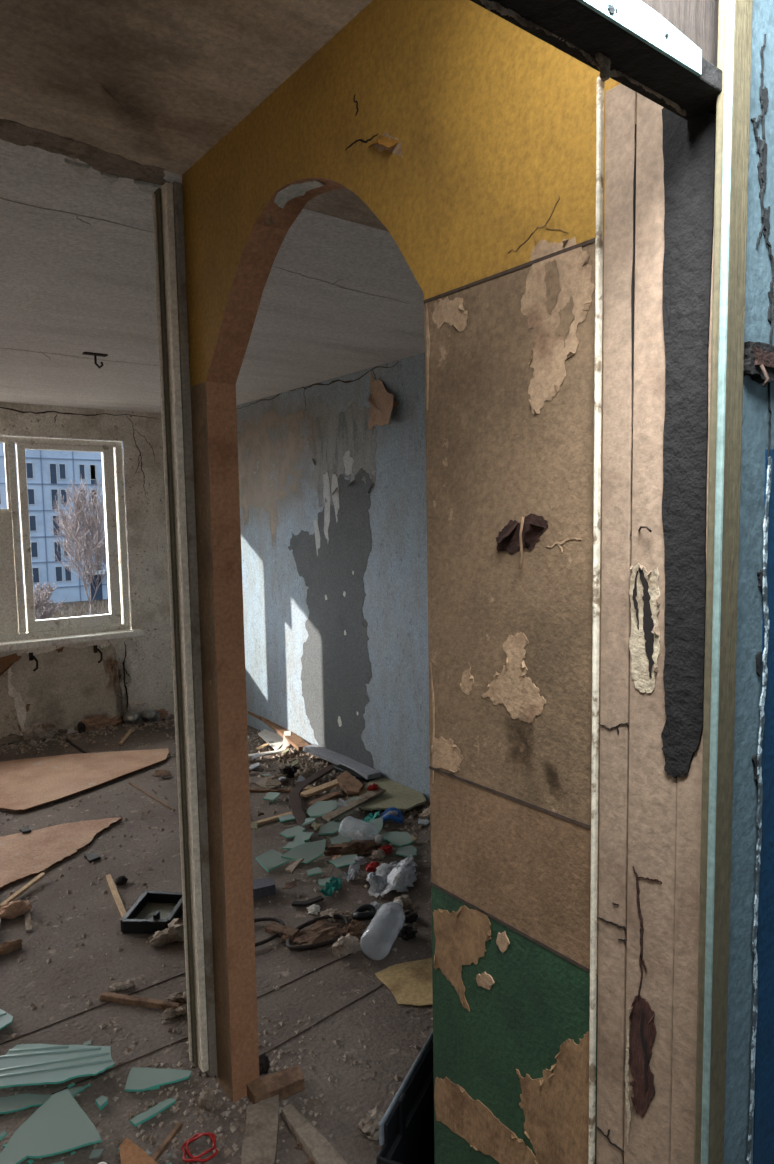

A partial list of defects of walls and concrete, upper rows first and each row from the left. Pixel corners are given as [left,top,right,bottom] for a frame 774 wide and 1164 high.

crack [750,34,774,345]
peeling [368,371,399,429]
peeling [426,296,468,410]
peeling [521,237,595,414]
crack [765,382,773,485]
peeling [288,450,375,769]
peeling [460,632,546,723]
peeling [433,905,510,1012]
crack [597,866,662,1001]
peeling [434,1031,589,1164]